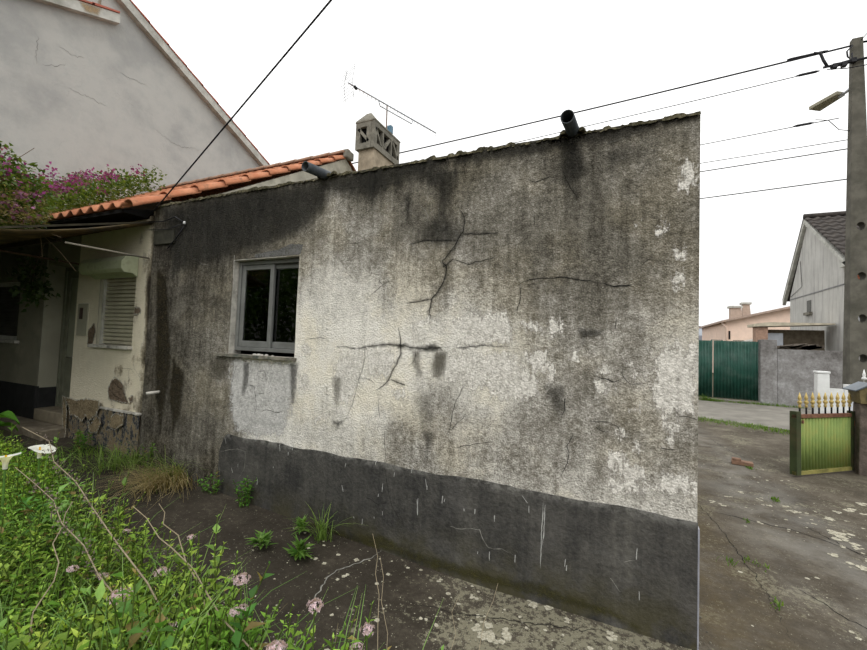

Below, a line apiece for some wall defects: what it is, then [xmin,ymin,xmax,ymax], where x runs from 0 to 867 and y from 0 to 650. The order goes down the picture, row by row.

peeling [678,158,700,195]
water stain [155,114,690,431]
crack [391,177,632,315]
peeling [672,272,685,292]
spalling [62,377,133,438]
peeling [594,364,617,395]
peeling [626,339,698,449]
peeling [607,428,697,499]
crack [697,504,865,643]